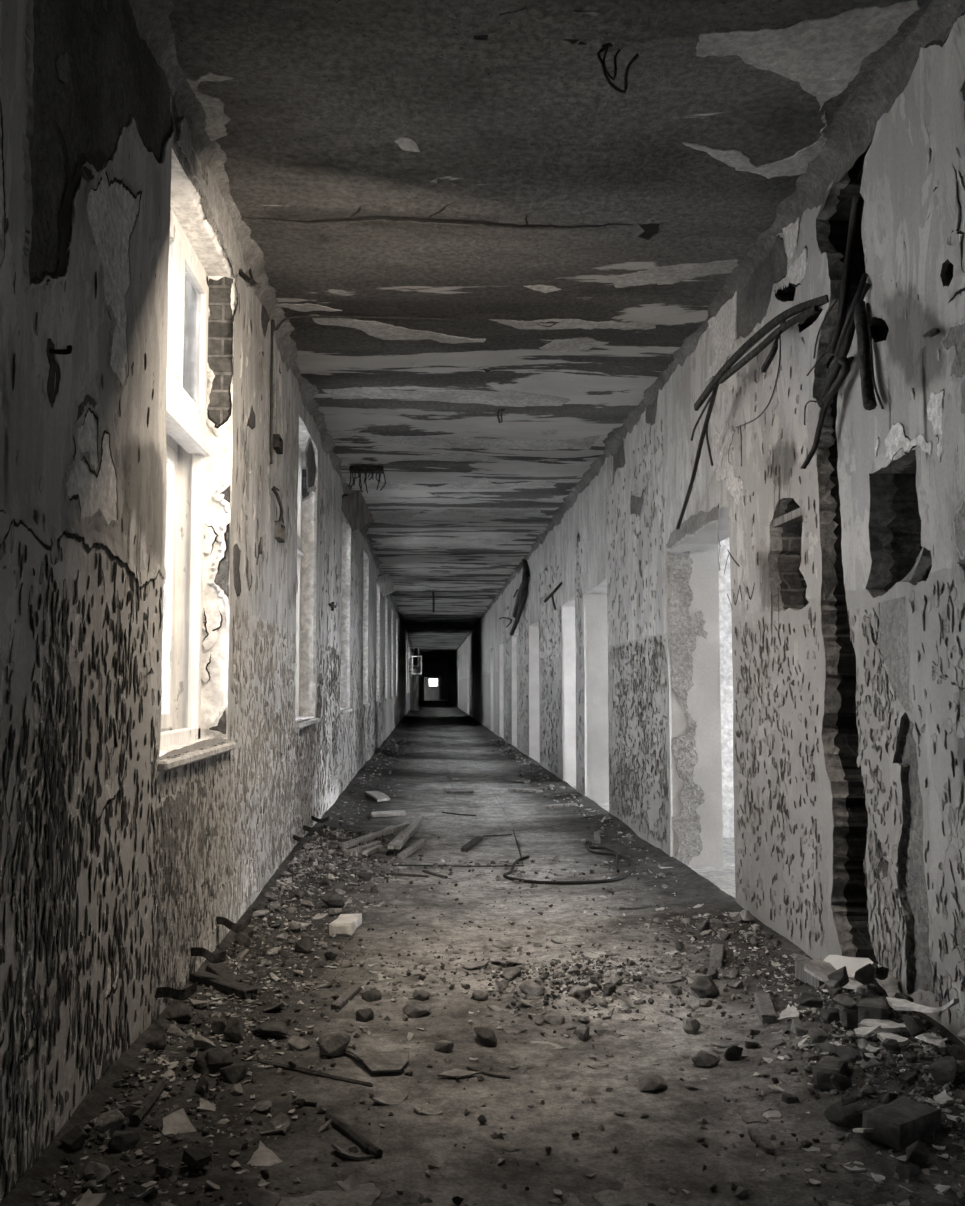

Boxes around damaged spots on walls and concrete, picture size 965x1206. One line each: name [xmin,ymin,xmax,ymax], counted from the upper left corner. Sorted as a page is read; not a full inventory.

peeling [322,387,570,407]
peeling [524,285,562,293]
peeling [489,319,656,352]
peeling [608,259,738,288]
spalling [705,216,808,382]
spalling [868,317,889,343]
spalling [940,236,953,287]
peeling [0,0,530,1202]
peeling [503,532,584,790]
peeling [607,389,720,866]
peeling [712,309,824,949]
spalling [847,423,965,1024]